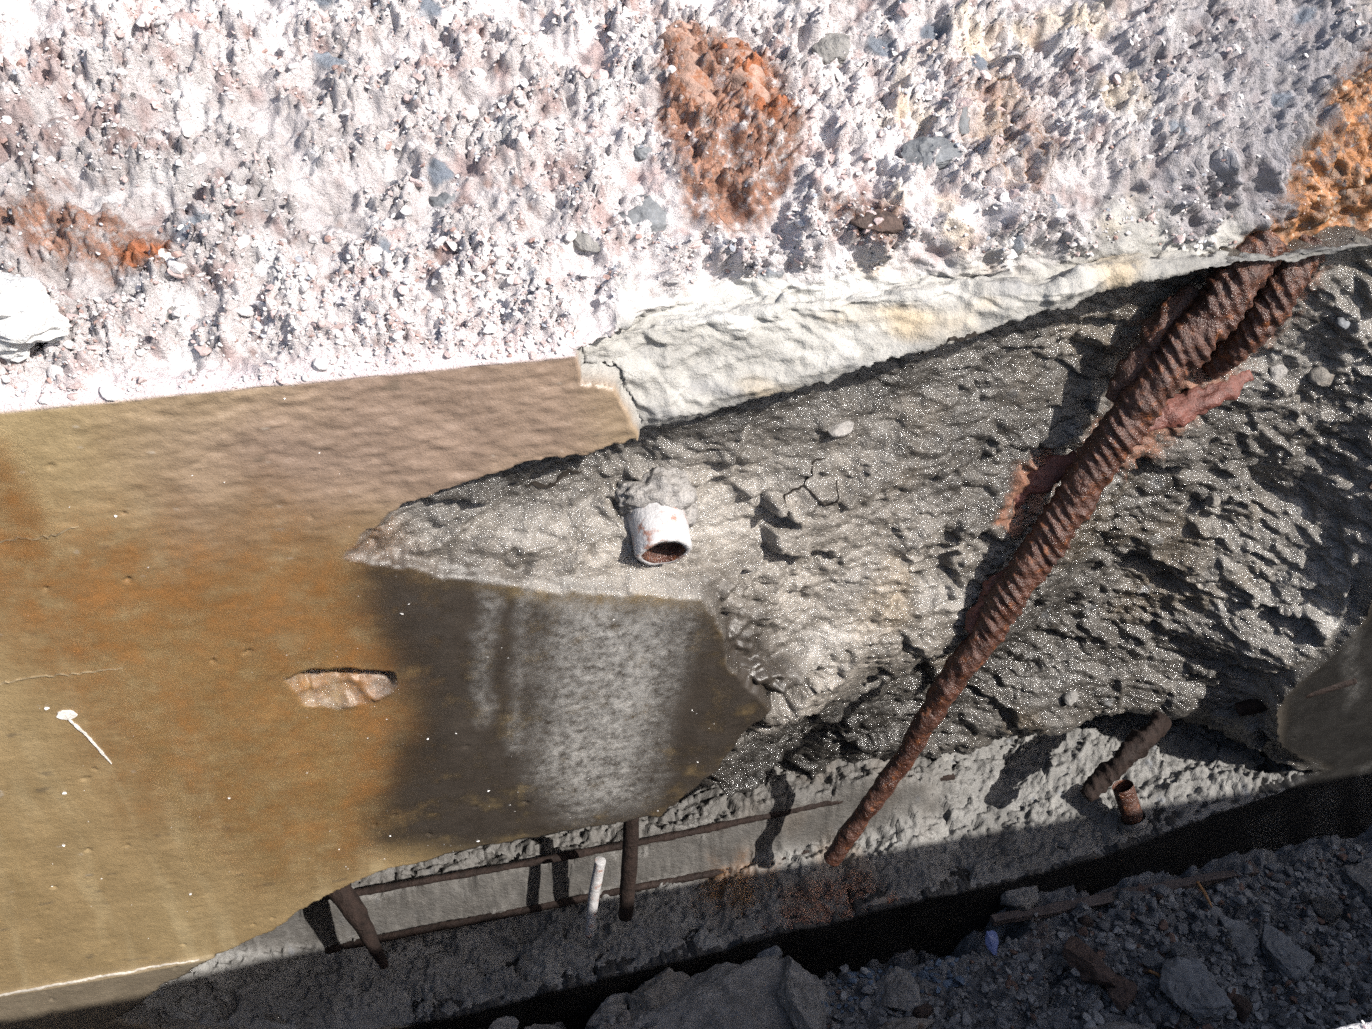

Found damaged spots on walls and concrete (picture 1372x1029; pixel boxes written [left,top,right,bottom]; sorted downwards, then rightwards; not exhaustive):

rust [0,191,168,271]
rust [659,21,803,231]
rust [1269,68,1372,250]
rust [996,449,1054,537]
rust [1124,428,1182,469]
rust [1175,340,1233,394]
spalling [116,200,1372,1029]
leakage [368,565,787,851]